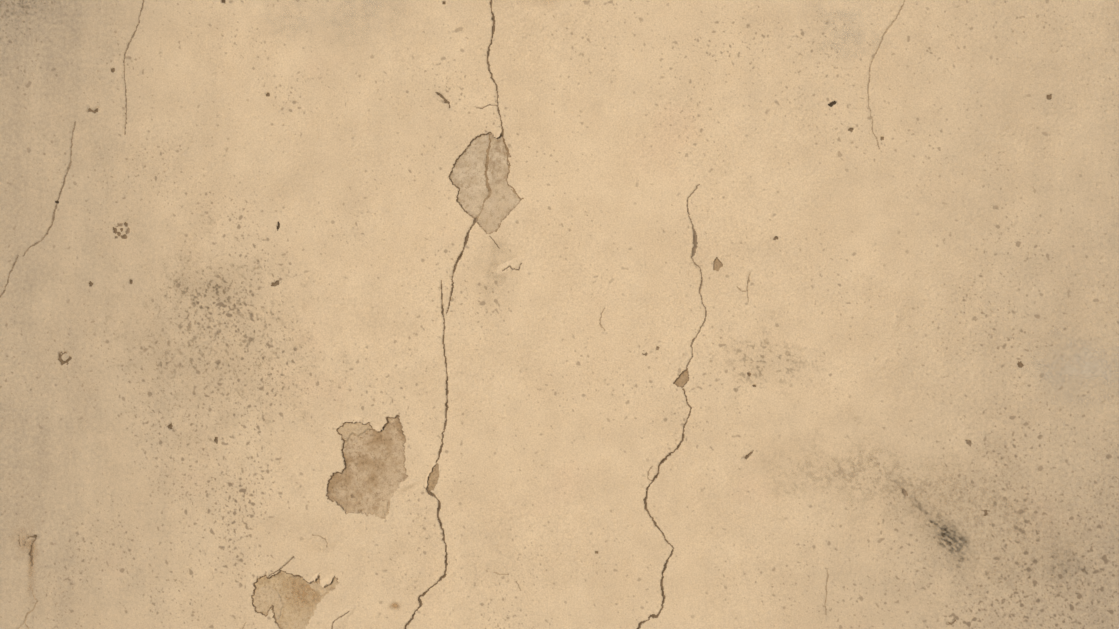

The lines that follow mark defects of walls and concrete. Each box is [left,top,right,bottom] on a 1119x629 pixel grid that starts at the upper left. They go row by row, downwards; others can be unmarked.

crack [123,0,144,135]
crack [867,0,905,149]
crack [0,121,76,297]
peeling [449,127,524,234]
crack [405,0,522,629]
peeling [326,415,409,519]
crack [637,184,707,629]
crack [18,535,38,629]
peeling [251,570,339,629]